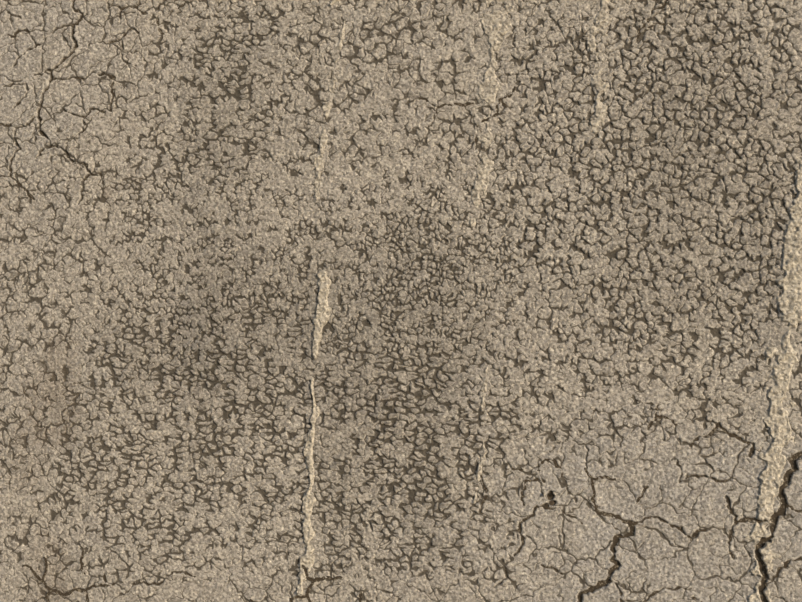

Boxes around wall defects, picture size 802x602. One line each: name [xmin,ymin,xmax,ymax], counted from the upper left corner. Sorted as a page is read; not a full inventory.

crack [1,0,187,201]
crack [647,405,677,429]
crack [22,548,196,602]
crack [289,565,342,602]
crack [501,458,707,602]
crack [676,422,802,602]